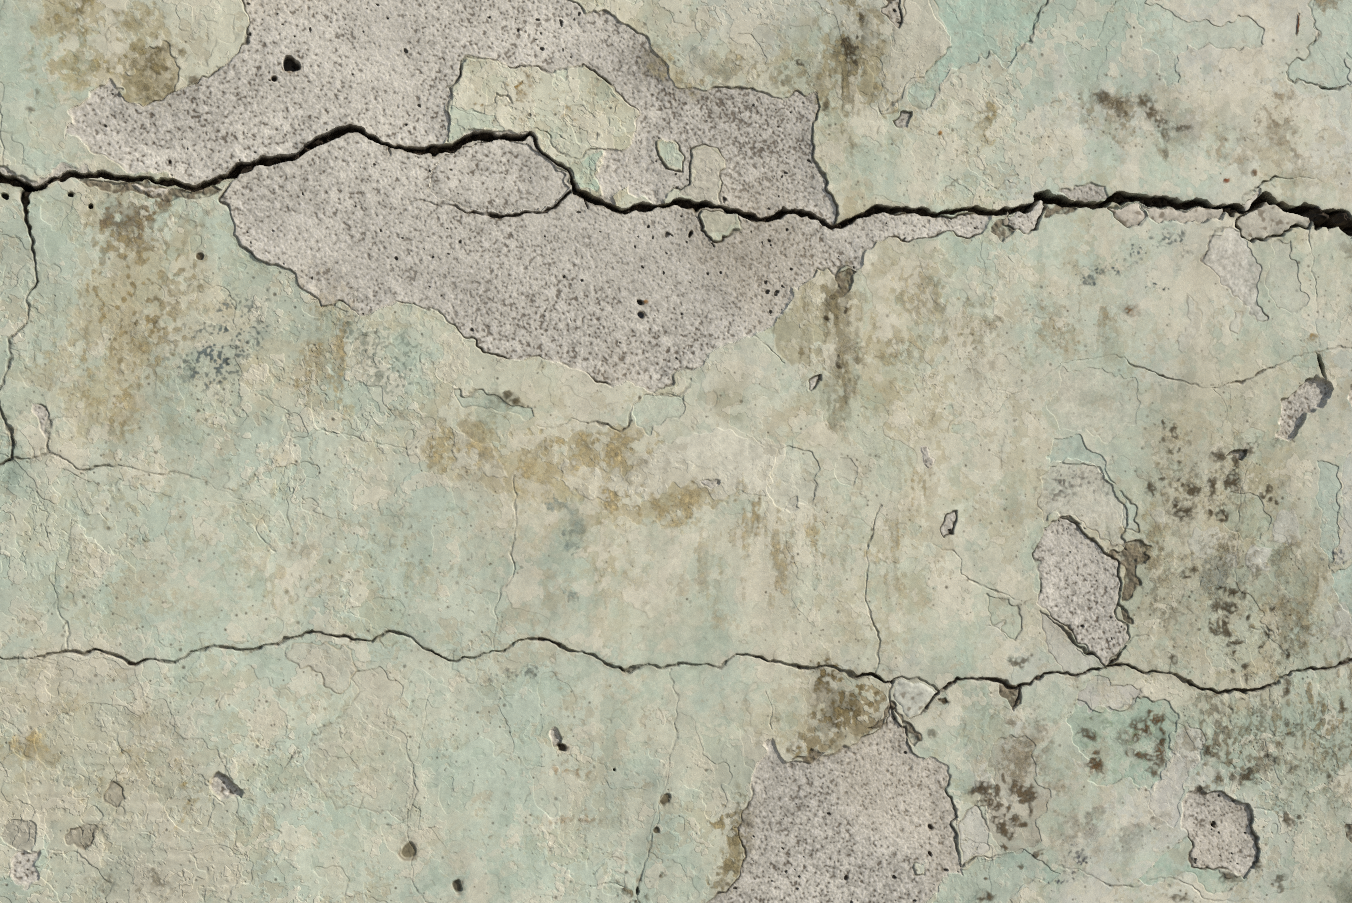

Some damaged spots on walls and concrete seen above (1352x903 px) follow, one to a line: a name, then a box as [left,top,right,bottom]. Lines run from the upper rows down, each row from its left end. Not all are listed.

crack [886,6,1046,112]
spalling [0,0,1147,513]
crack [0,52,1352,767]
spalling [1274,374,1352,442]
spalling [1032,434,1261,894]
peeling [1187,492,1302,673]
crack [407,767,428,903]
spalling [707,680,1061,903]